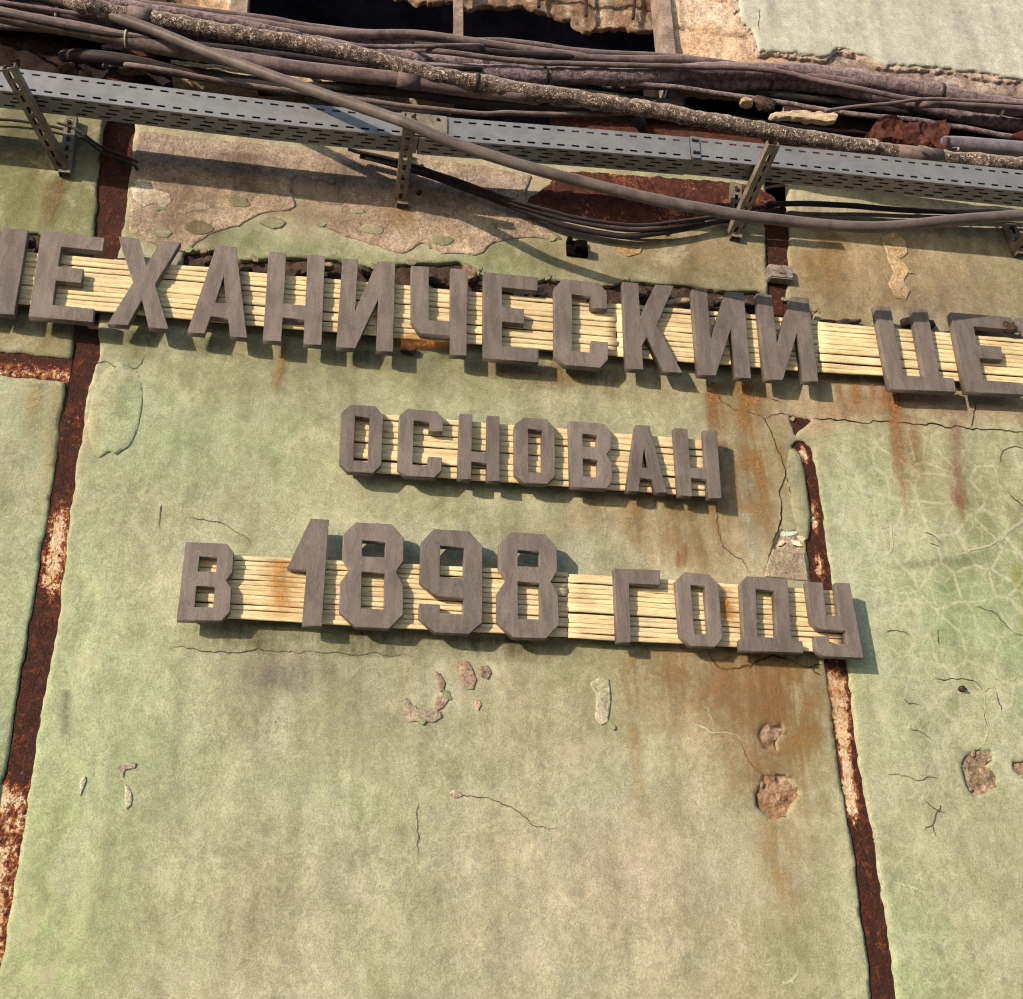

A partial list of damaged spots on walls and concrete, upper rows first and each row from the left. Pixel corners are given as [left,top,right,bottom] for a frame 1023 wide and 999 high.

peeling [128,131,562,292]
rust [527,171,780,227]
spalling [603,276,654,309]
peeling [879,232,913,302]
crack [816,402,1023,463]
crack [710,380,790,573]
peeling [765,531,809,581]
crack [934,678,1002,725]
crack [463,795,553,829]
spalling [755,773,798,821]
crack [889,773,946,835]
spalling [962,750,996,796]